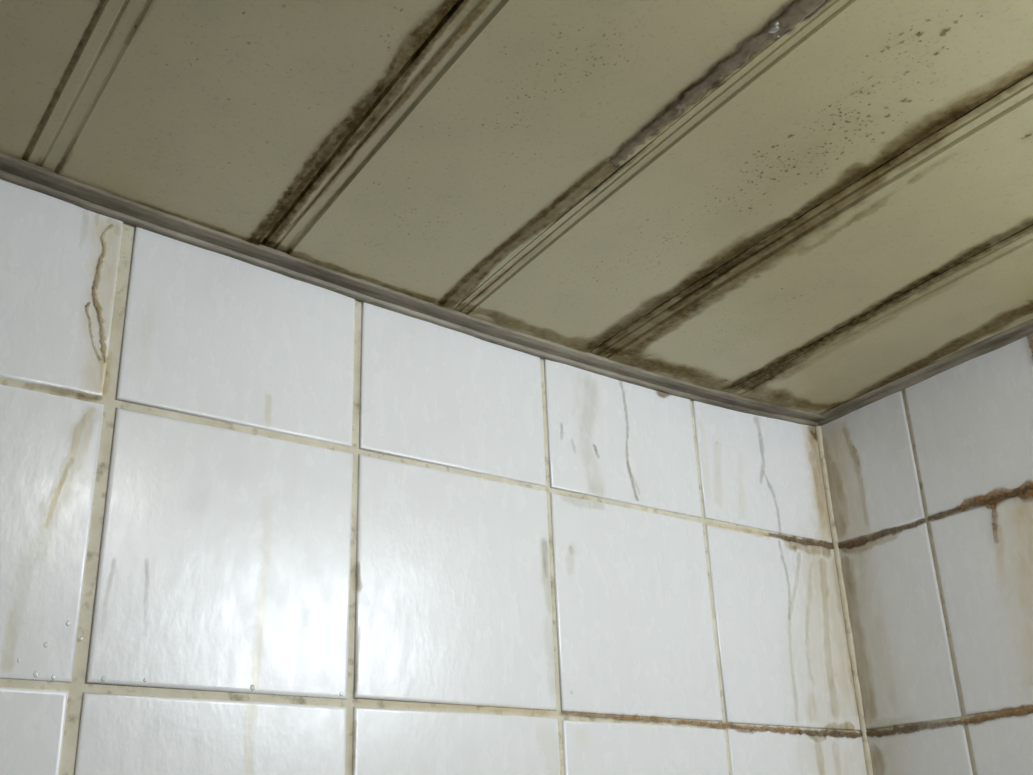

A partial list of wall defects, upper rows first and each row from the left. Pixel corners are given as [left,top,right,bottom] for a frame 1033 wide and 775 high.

leakage [339,1,464,165]
leakage [591,0,832,192]
leakage [739,221,1033,390]
rust [770,481,1033,549]
rust [563,705,1033,738]